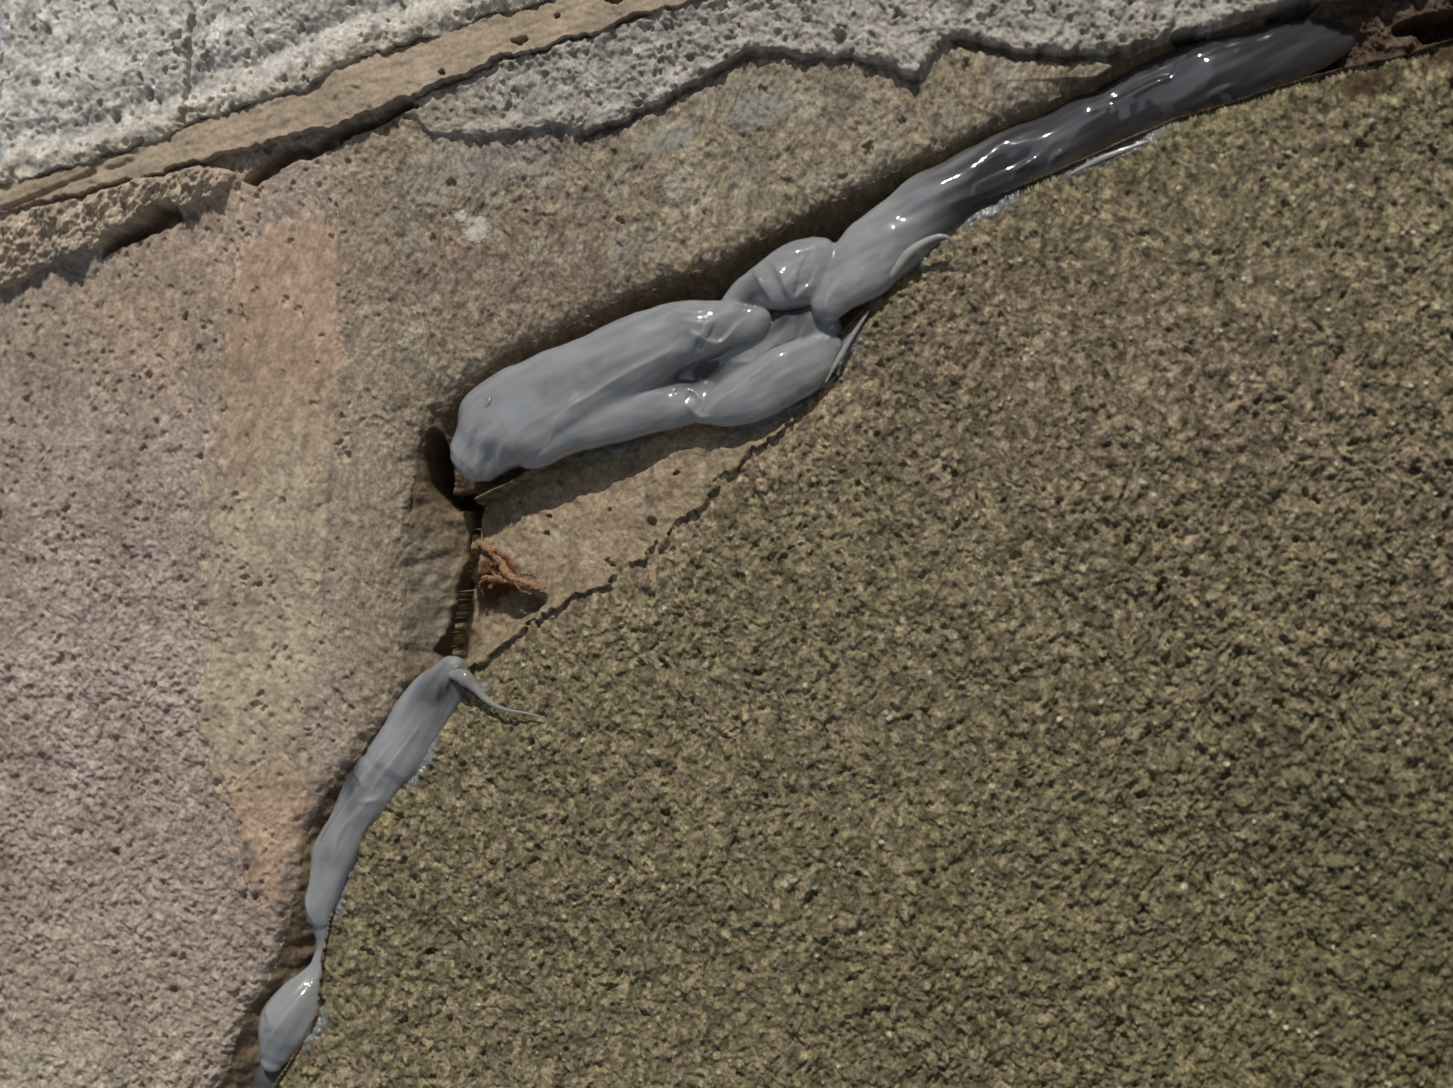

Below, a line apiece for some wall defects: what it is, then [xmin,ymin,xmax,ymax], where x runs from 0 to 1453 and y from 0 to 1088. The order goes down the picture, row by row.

crack [180,0,197,124]
spalling [0,111,401,291]
crack [988,66,1337,199]
spalling [454,374,838,668]
crack [221,17,1268,1088]